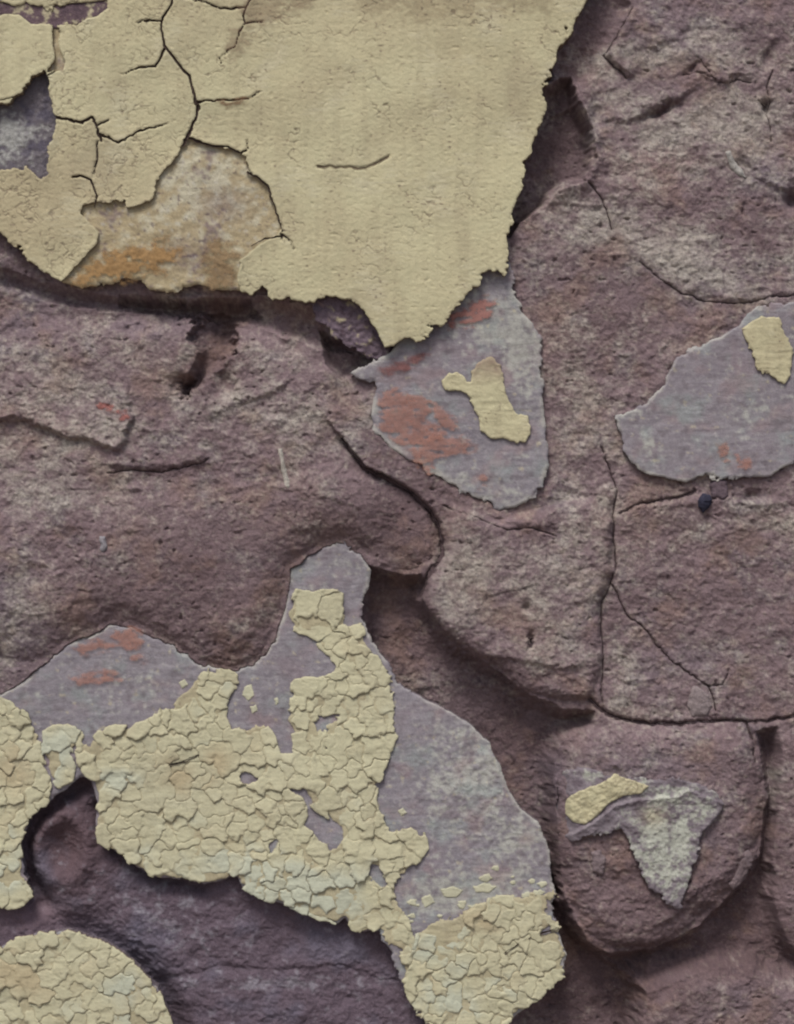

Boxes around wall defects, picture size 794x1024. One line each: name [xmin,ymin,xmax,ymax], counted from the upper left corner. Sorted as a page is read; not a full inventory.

crack [56,116,163,207]
crack [125,0,294,247]
flaking render [0,0,588,511]
crack [317,156,389,169]
crack [342,438,452,597]
corrosion [378,388,468,475]
crack [589,447,794,763]
flaking render [614,302,794,500]
peeling [0,542,567,1024]
flaking render [556,766,724,910]